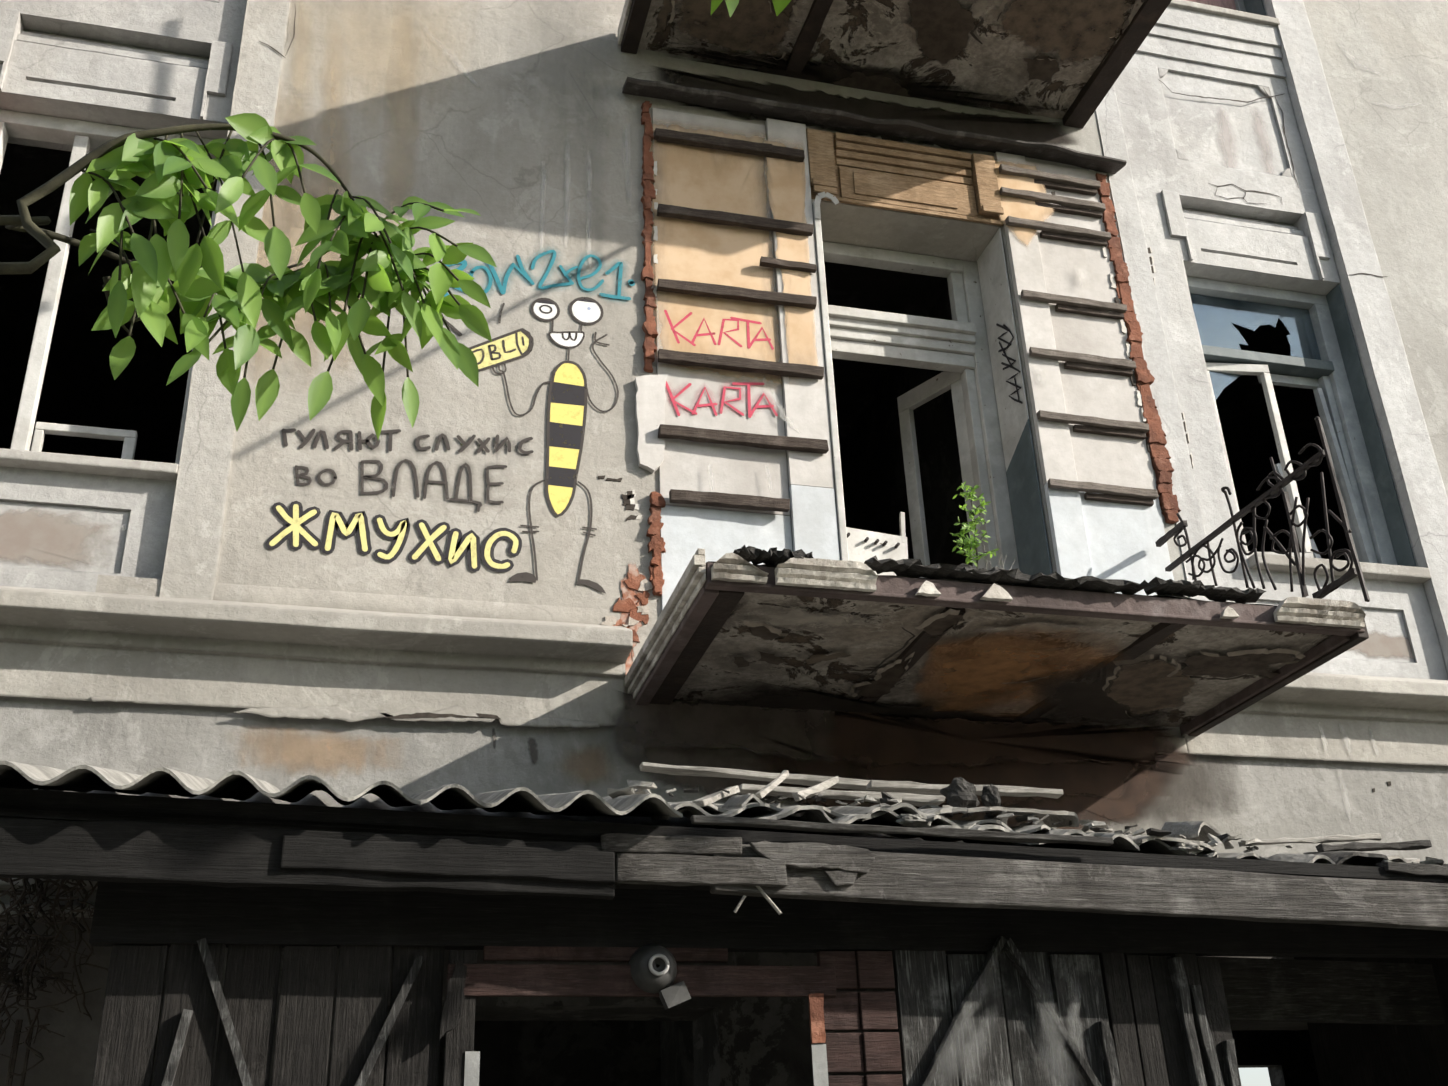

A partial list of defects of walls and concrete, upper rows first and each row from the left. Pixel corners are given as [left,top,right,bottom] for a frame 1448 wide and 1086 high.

spalling [653,0,798,60]
spalling [904,0,1139,84]
spalling [832,71,913,98]
peeling [634,101,668,473]
spalling [1089,169,1181,524]
flaking render [1181,412,1194,469]
flaking render [0,509,102,565]
flaking render [598,475,666,674]
spalling [734,621,788,667]
damp [764,608,848,626]
damp [987,622,1096,653]
flaking render [1347,632,1414,659]